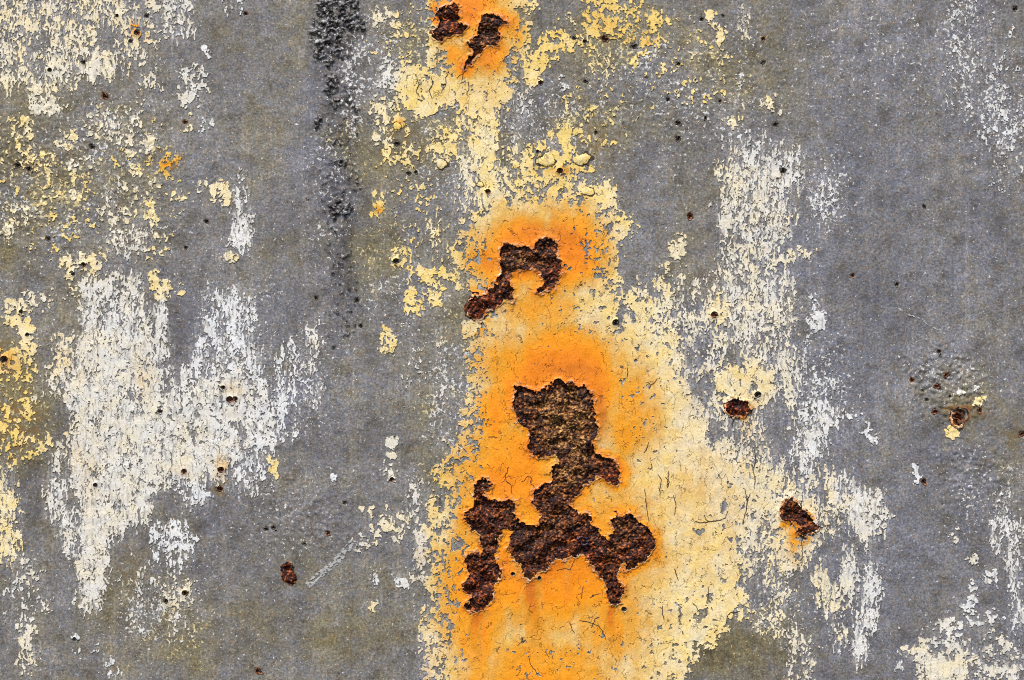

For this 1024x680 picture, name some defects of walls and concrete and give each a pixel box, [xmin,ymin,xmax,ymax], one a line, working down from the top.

rust [428,0,525,79]
peeling [0,0,324,678]
peeling [343,0,896,680]
rust [435,202,667,680]
rust [723,396,753,420]
rust [944,395,990,429]
rust [778,495,820,552]
rust [280,561,298,585]